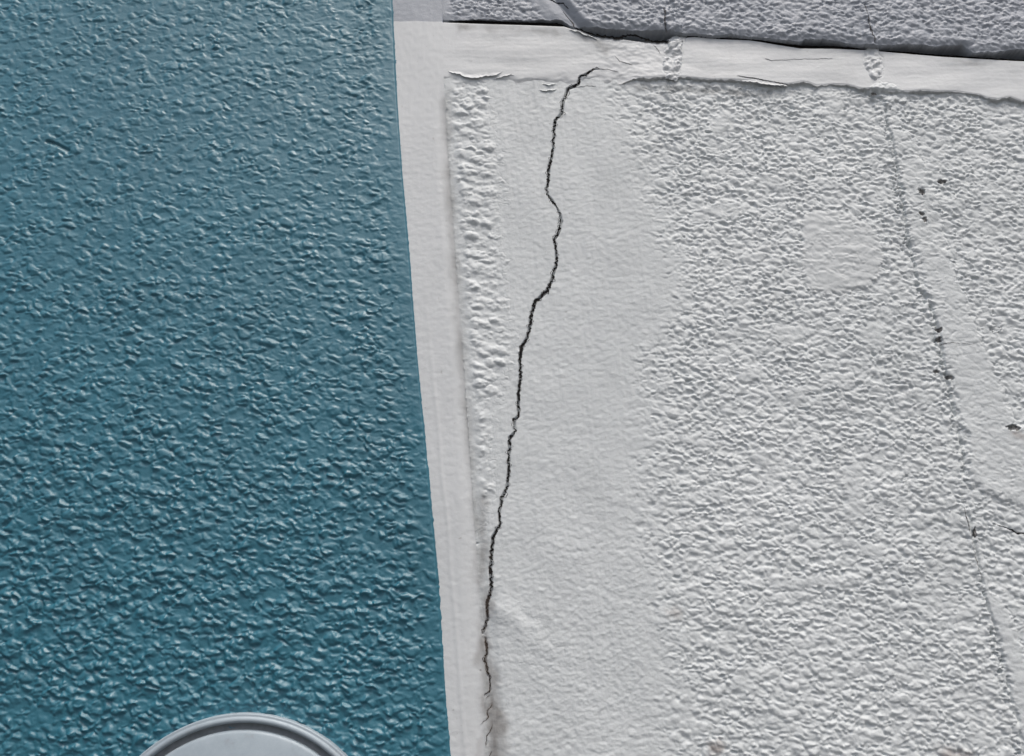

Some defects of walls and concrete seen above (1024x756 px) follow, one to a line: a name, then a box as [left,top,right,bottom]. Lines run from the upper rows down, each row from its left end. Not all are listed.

crack [481,0,670,756]